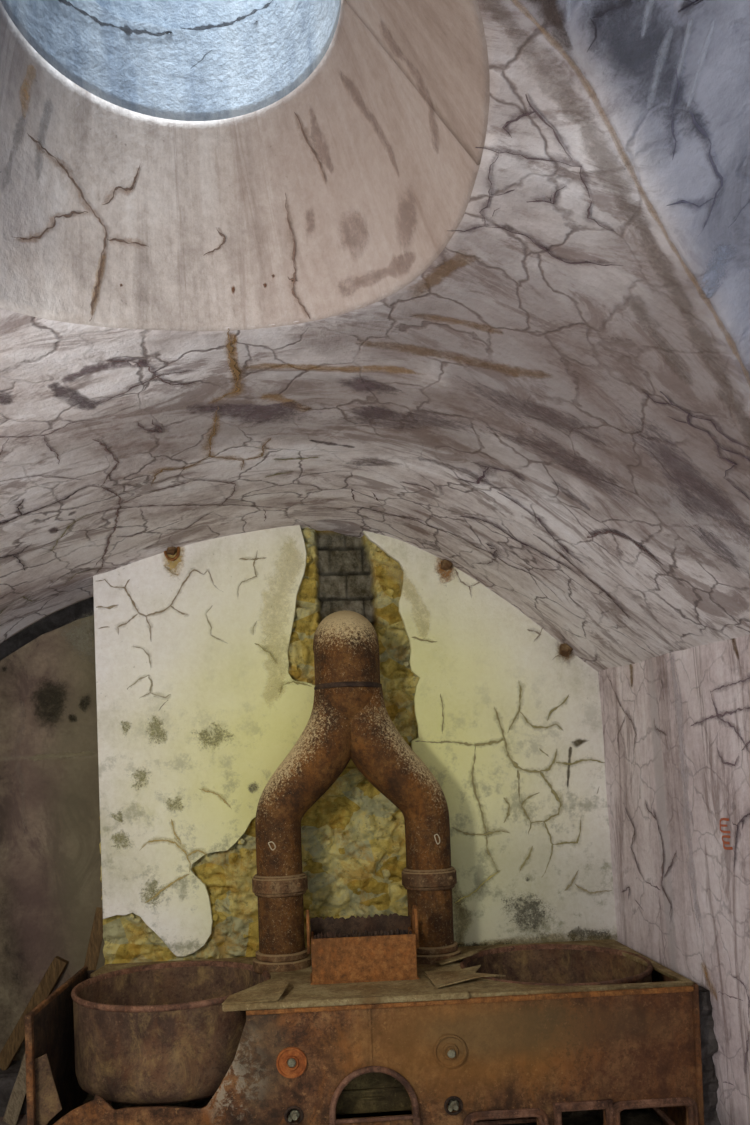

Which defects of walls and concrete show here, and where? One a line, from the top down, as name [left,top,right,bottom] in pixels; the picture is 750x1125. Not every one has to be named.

crack [11,133,147,319]
crack [454,94,623,266]
crack [0,328,321,710]
crack [336,462,663,621]
damp [34,681,89,723]
damp [111,812,130,848]
damp [147,716,167,744]
spalling [103,817,259,965]
damp [192,723,233,748]
spalling [288,527,419,748]
spalling [301,759,408,954]
crack [415,675,676,919]